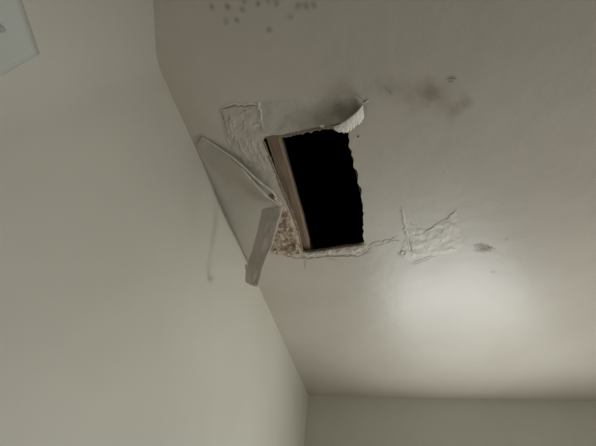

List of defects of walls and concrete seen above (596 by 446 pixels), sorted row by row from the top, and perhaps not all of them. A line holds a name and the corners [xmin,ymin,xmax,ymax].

peeling [196,100,369,287]
crack [281,235,398,266]